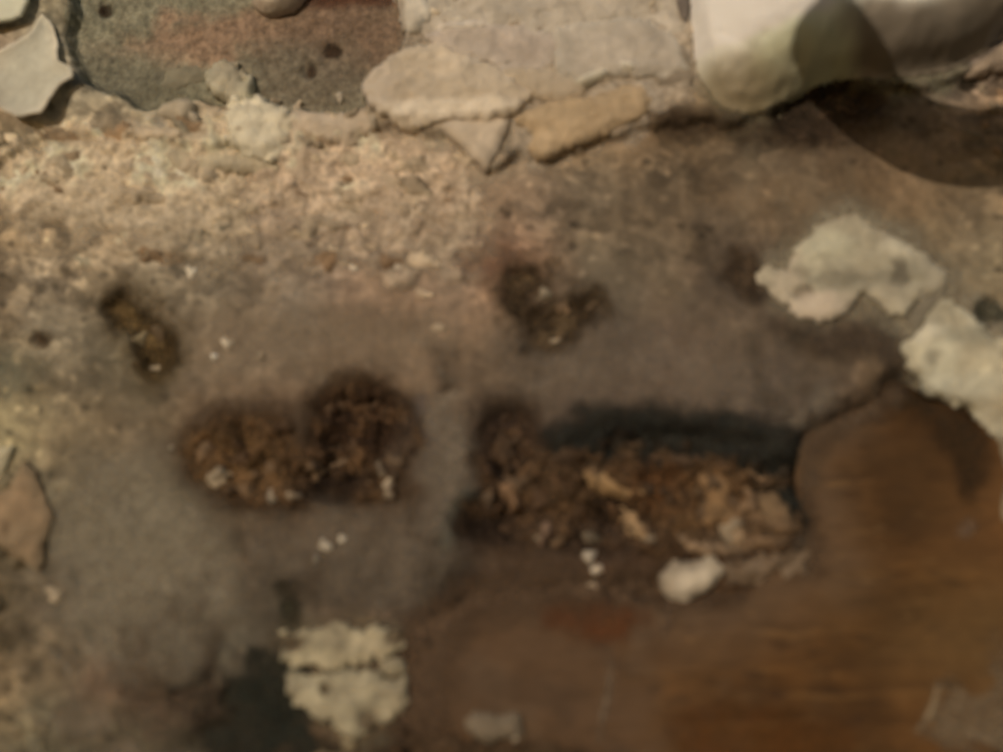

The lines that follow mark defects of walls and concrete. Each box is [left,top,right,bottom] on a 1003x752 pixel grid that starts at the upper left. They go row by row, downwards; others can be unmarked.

flaking render [0,0,698,300]
hole [103,285,182,383]
hole [486,266,610,352]
hole [179,366,426,522]
hole [450,405,805,566]
water stain [167,647,342,752]